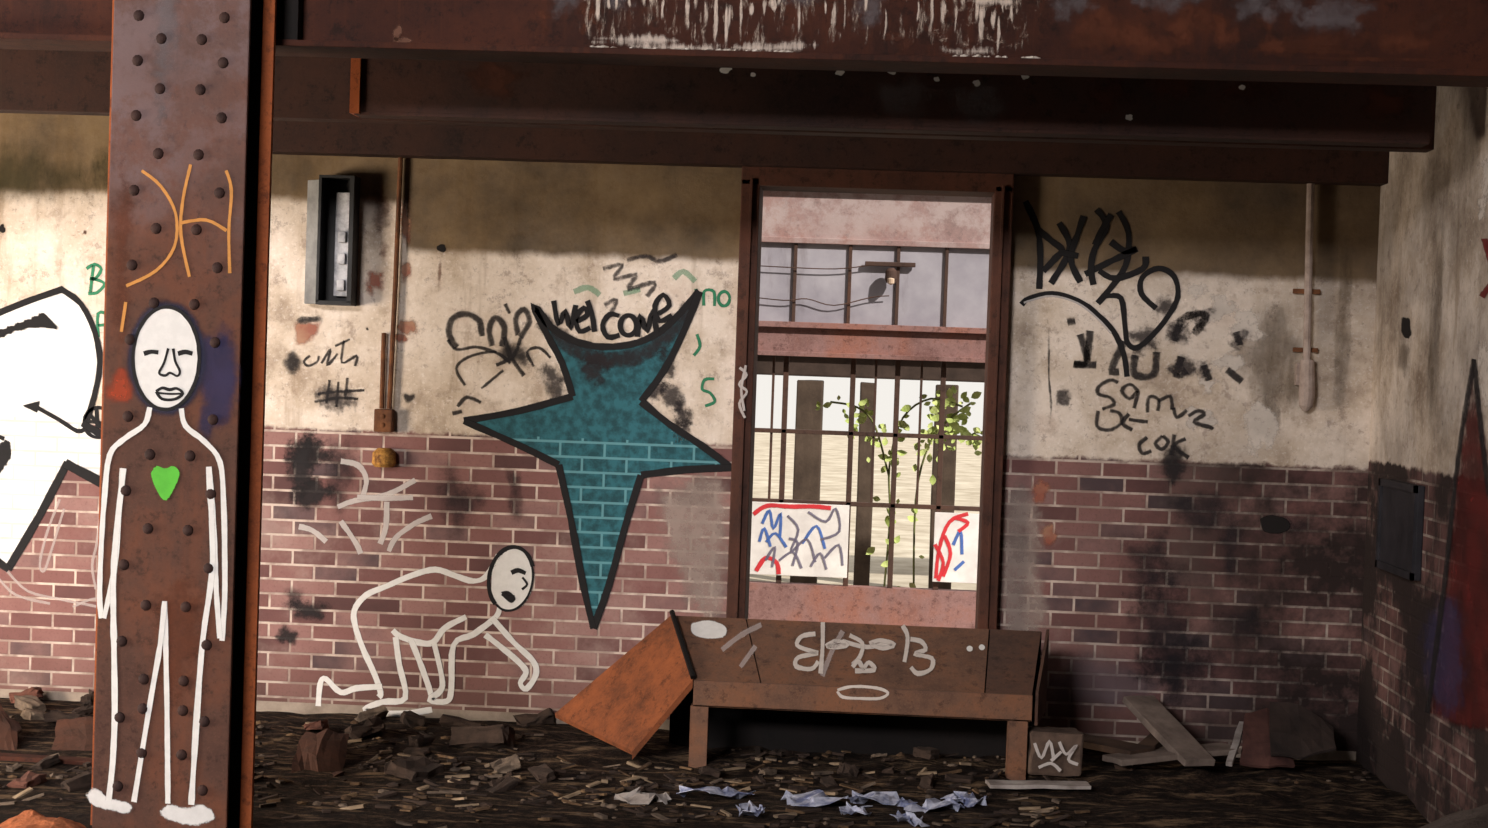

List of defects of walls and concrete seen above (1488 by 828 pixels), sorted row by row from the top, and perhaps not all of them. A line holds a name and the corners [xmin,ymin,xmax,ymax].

rust [167,585,200,683]